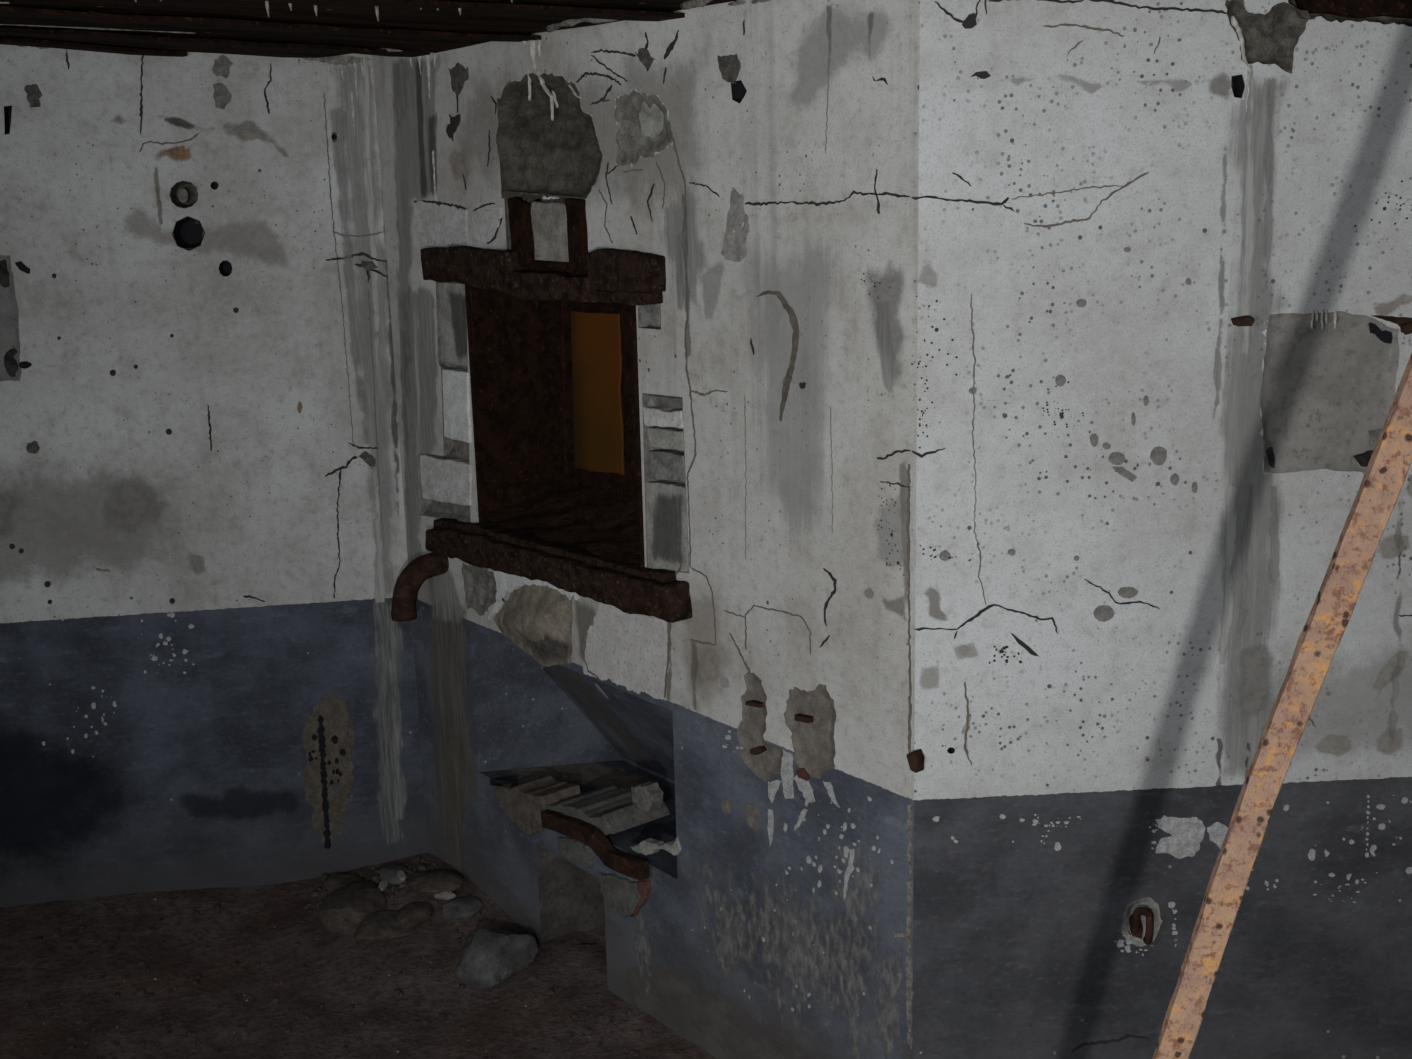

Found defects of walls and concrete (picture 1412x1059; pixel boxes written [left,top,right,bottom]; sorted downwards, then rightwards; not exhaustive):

spalling [496,73,673,205]
crack [823,23,831,154]
spalling [1225,0,1412,74]
damp [298,48,500,874]
crack [598,137,1159,753]
damp [1210,15,1282,788]
peeling [1260,311,1412,473]
crack [581,631,599,678]
peeling [583,602,668,700]
crack [964,681,972,766]
peeling [701,672,914,1059]
peeling [1149,815,1228,859]